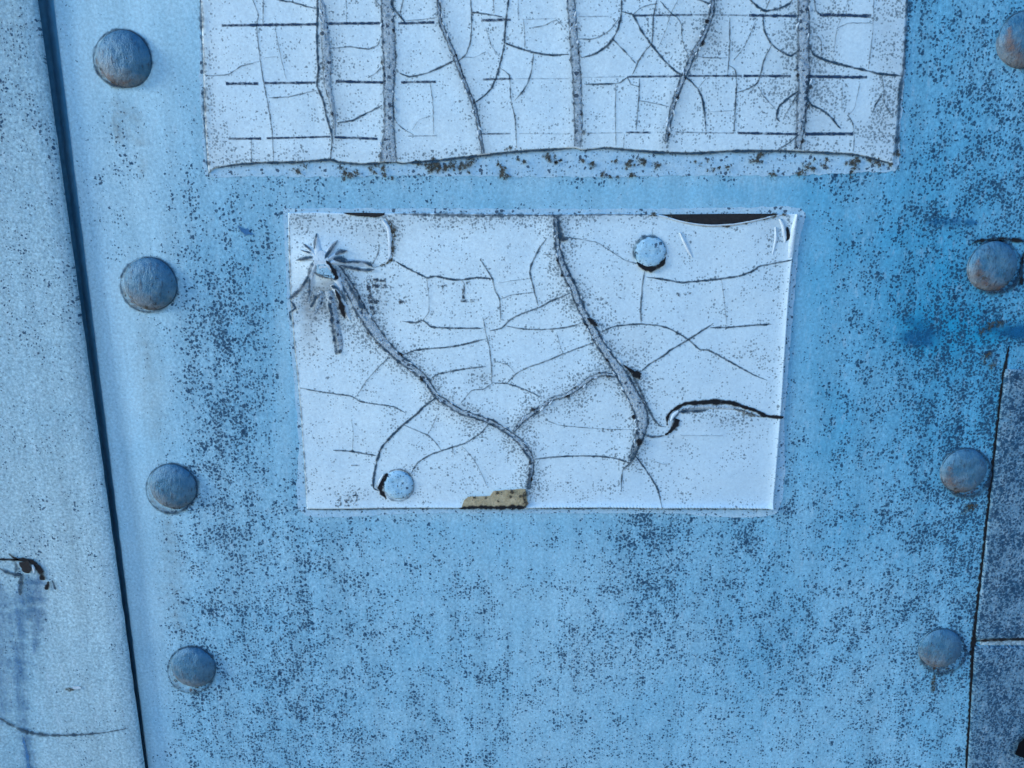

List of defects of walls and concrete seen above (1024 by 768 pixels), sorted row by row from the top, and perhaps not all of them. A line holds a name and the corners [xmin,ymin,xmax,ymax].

crack [199,0,909,177]
crack [289,213,793,510]
peeling [459,489,528,510]